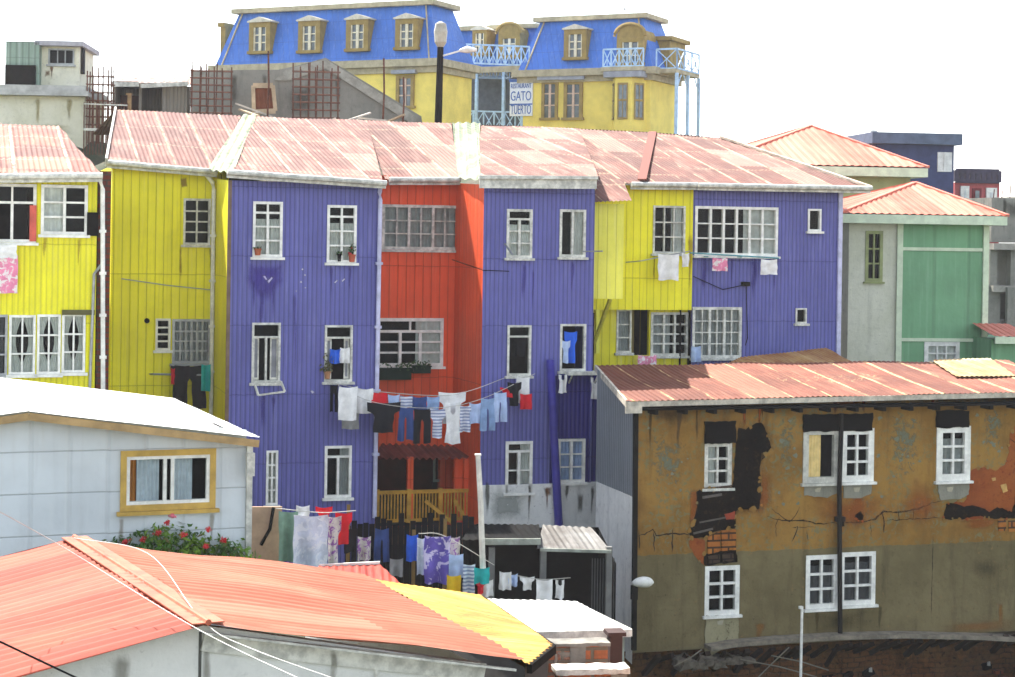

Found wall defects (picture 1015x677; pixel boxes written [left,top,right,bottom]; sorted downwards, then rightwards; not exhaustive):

flaking render [687,416,801,566]
crack [767,502,937,541]
flaking render [942,410,1015,532]